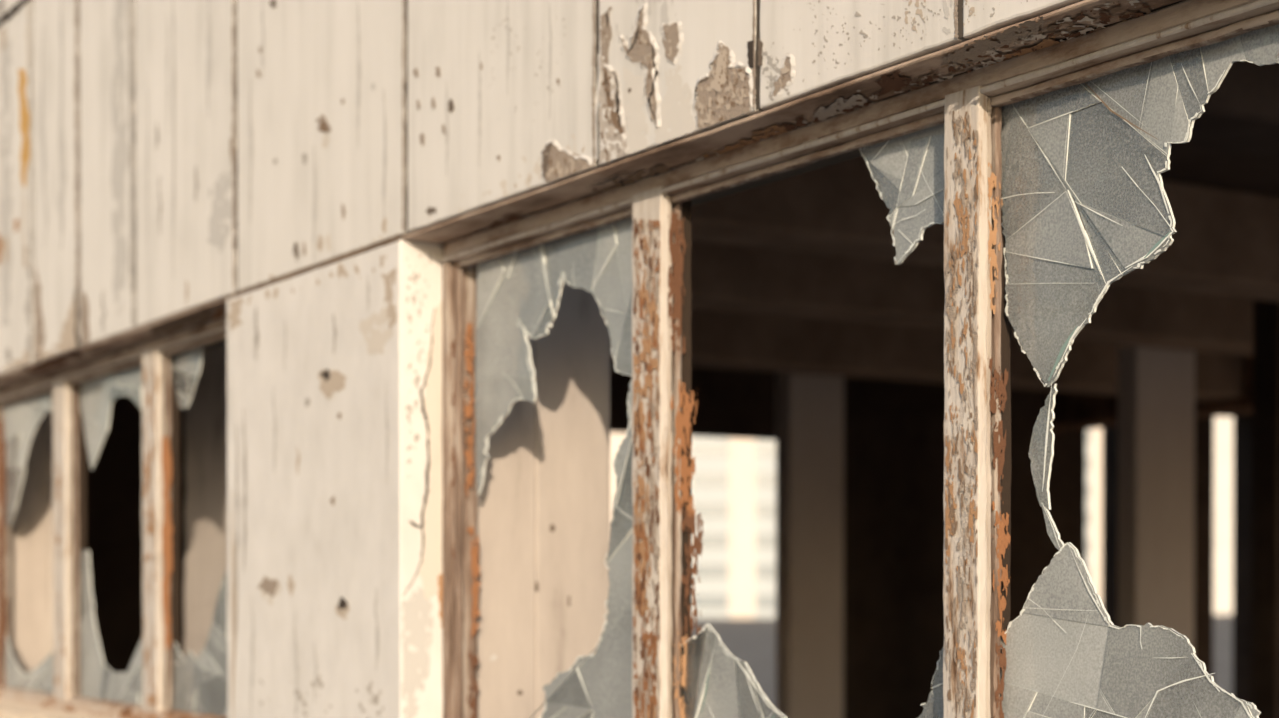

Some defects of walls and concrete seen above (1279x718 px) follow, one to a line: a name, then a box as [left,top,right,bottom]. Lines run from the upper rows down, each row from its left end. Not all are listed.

corrosion [18,68,30,187]
peeling [540,2,684,182]
peeling [692,38,763,129]
corrosion [592,1,1158,193]
corrosion [464,212,523,238]
crack [403,309,435,595]
corrosion [451,322,475,497]
corrosion [945,111,1011,718]
corrosion [438,573,455,628]
corrosion [467,526,481,718]